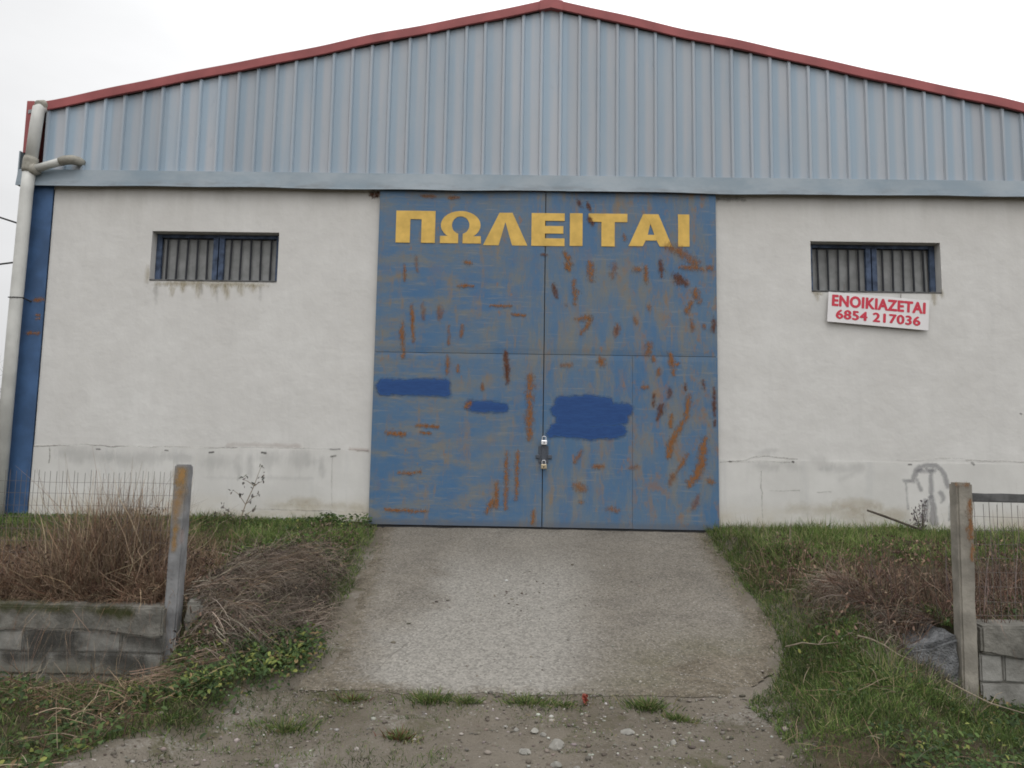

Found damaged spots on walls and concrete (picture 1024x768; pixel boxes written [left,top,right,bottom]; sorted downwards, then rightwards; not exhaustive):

rust [399,305,415,358]
rust [563,252,593,335]
rust [634,245,716,333]
rust [525,373,535,441]
rust [641,384,714,487]
rust [485,449,520,513]